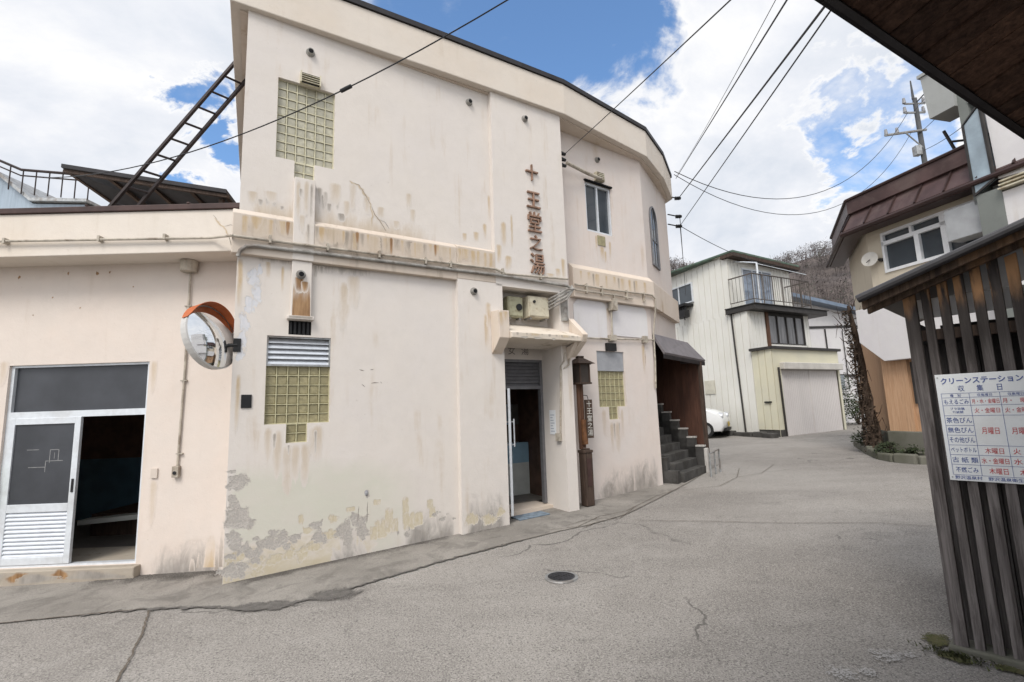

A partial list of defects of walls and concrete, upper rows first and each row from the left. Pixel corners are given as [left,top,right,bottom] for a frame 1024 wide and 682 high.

damp [247,180,454,263]
crack [350,181,389,231]
peeling [235,263,263,362]
spalling [213,469,500,582]